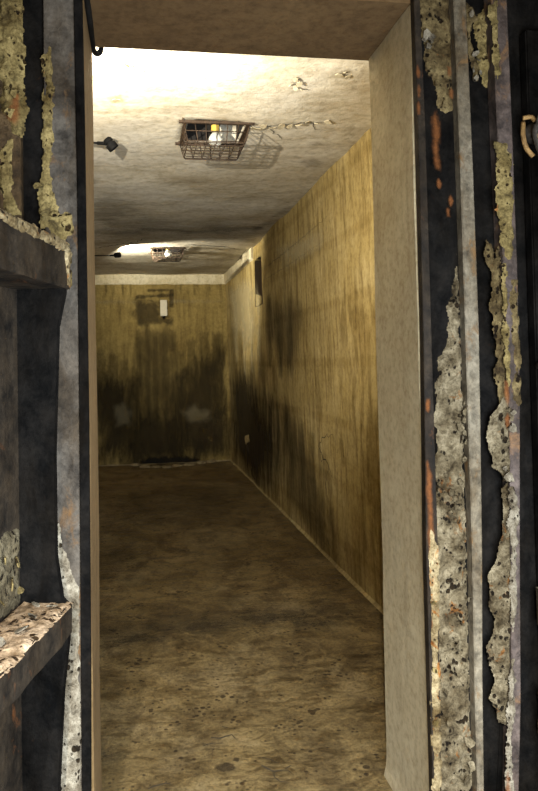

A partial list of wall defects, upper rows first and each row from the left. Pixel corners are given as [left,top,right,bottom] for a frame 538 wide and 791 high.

peeling [0,0,74,290]
peeling [466,0,501,88]
peeling [0,523,82,791]
water stain [97,347,287,485]
peeling [428,266,475,791]
peeling [484,141,522,791]